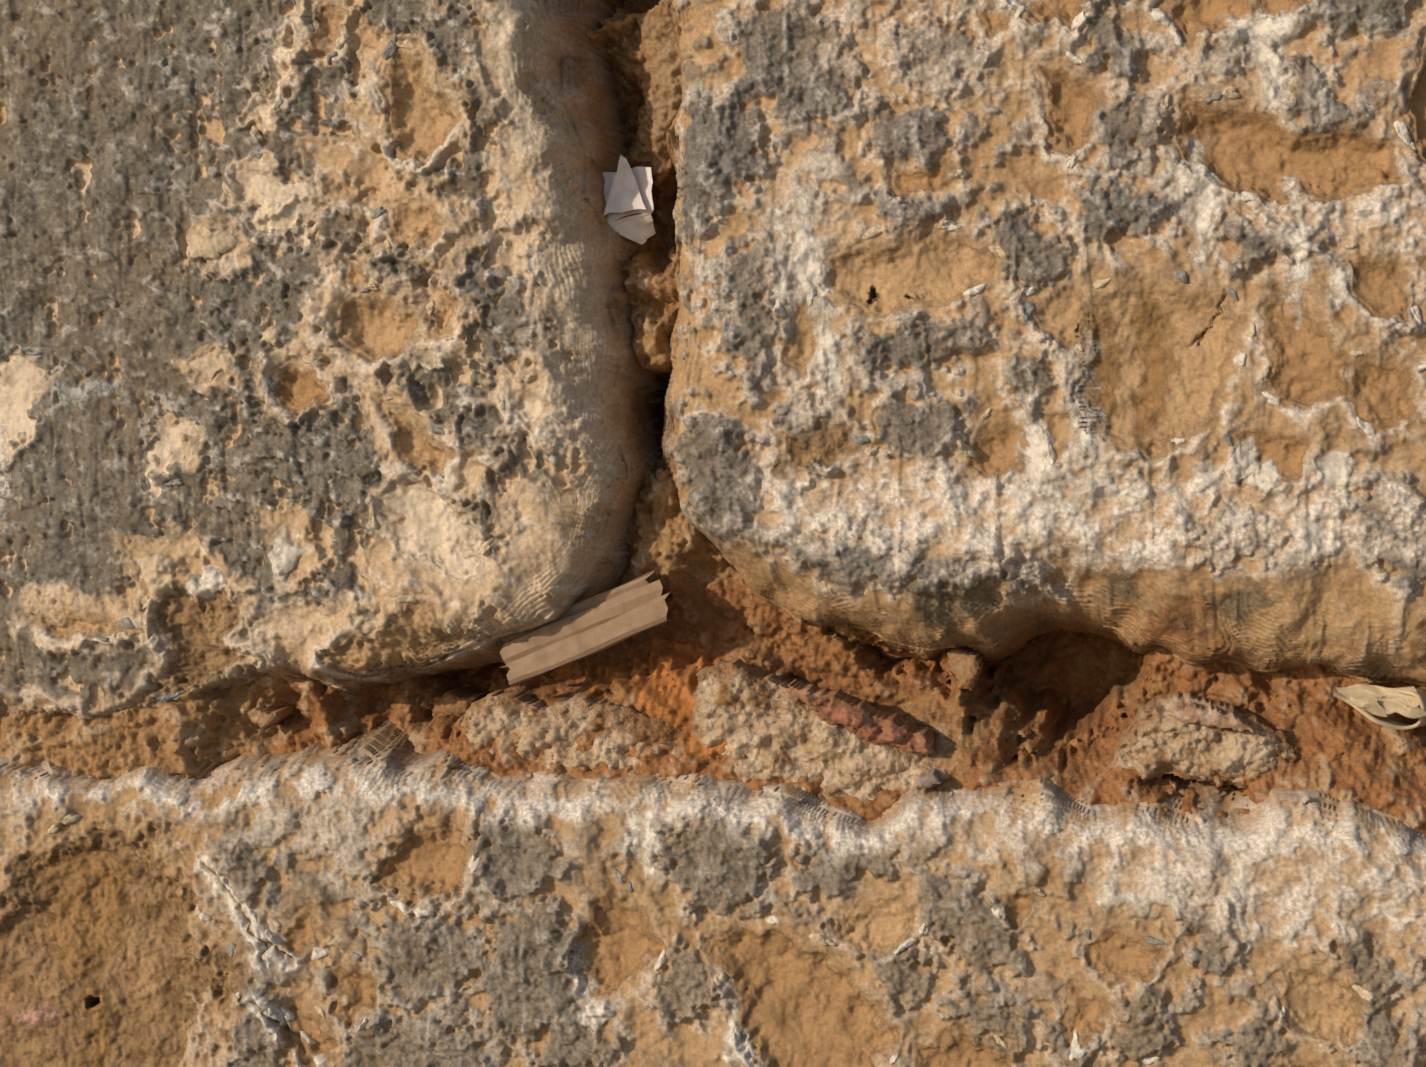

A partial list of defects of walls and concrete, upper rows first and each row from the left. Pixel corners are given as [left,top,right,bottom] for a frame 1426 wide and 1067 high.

crack [1189,292,1227,346]